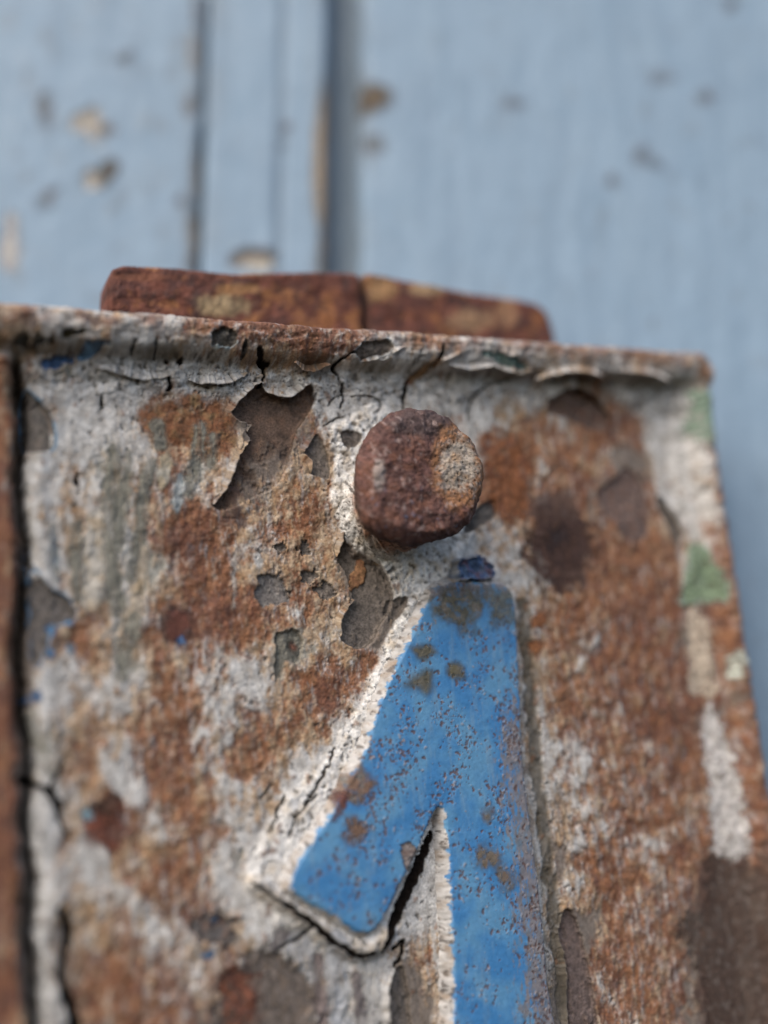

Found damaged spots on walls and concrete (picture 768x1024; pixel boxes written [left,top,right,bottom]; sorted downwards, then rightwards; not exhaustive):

crack [130,339,172,392]
rust [138,385,236,461]
peeling [189,361,331,511]
crack [256,346,270,389]
crack [327,344,445,425]
peeling [441,349,612,432]
rust [166,605,192,645]
peeling [272,540,311,556]
peeling [300,528,408,649]
rust [479,426,606,595]
crack [251,830,433,968]
rust [477,846,514,889]